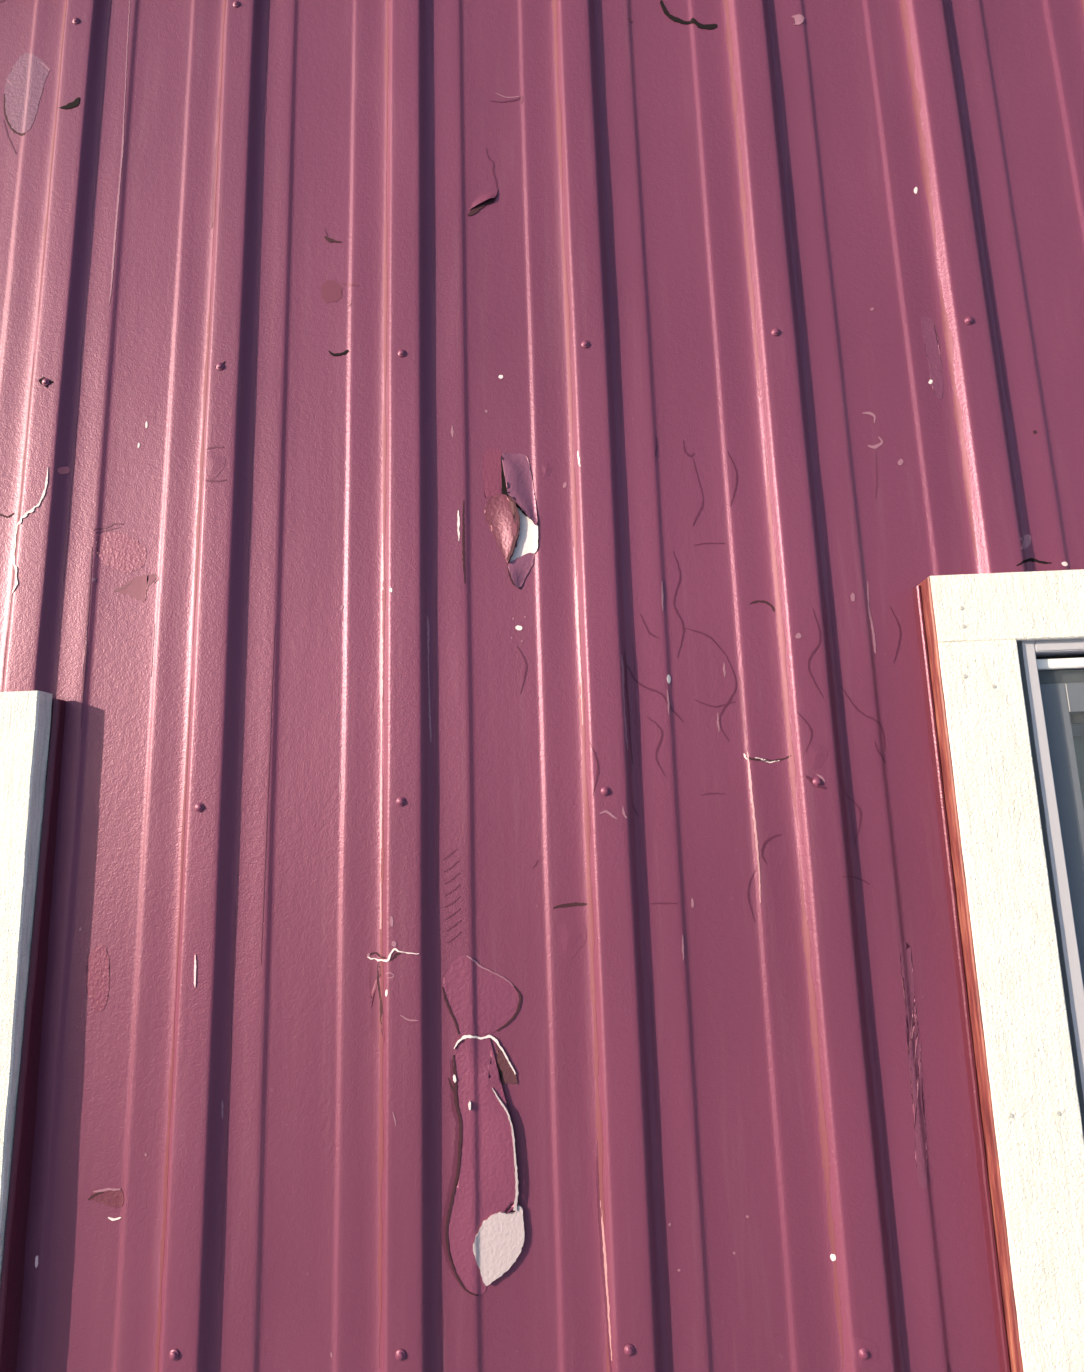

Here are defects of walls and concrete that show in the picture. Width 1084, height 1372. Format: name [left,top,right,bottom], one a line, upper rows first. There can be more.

peeling [4,53,49,133]
crack [0,468,48,679]
peeling [510,508,538,562]
crack [367,948,419,1035]
peeling [473,1205,525,1286]